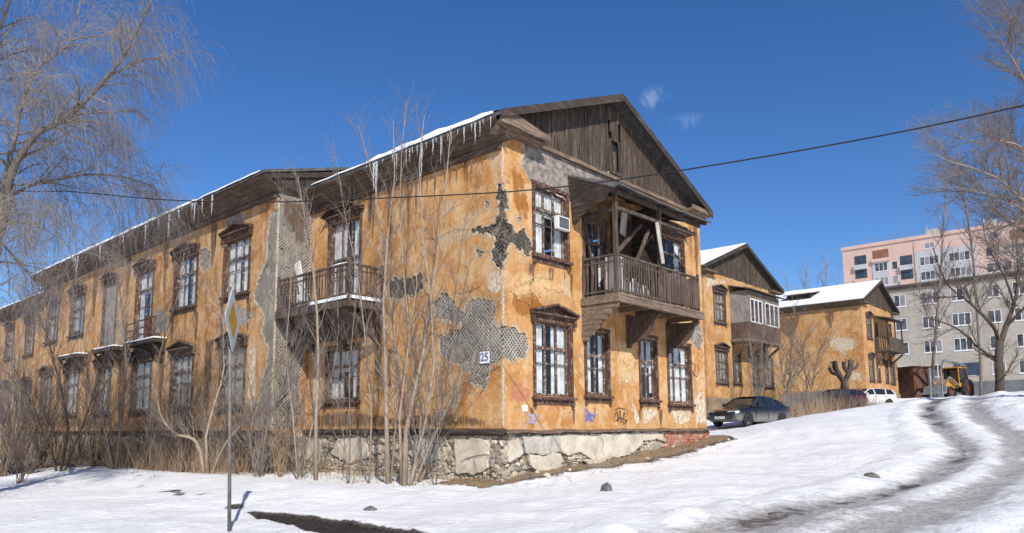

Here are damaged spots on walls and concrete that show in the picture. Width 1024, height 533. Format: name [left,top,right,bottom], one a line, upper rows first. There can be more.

spalling [221,193,322,434]
spalling [385,272,424,302]
spalling [432,144,533,427]